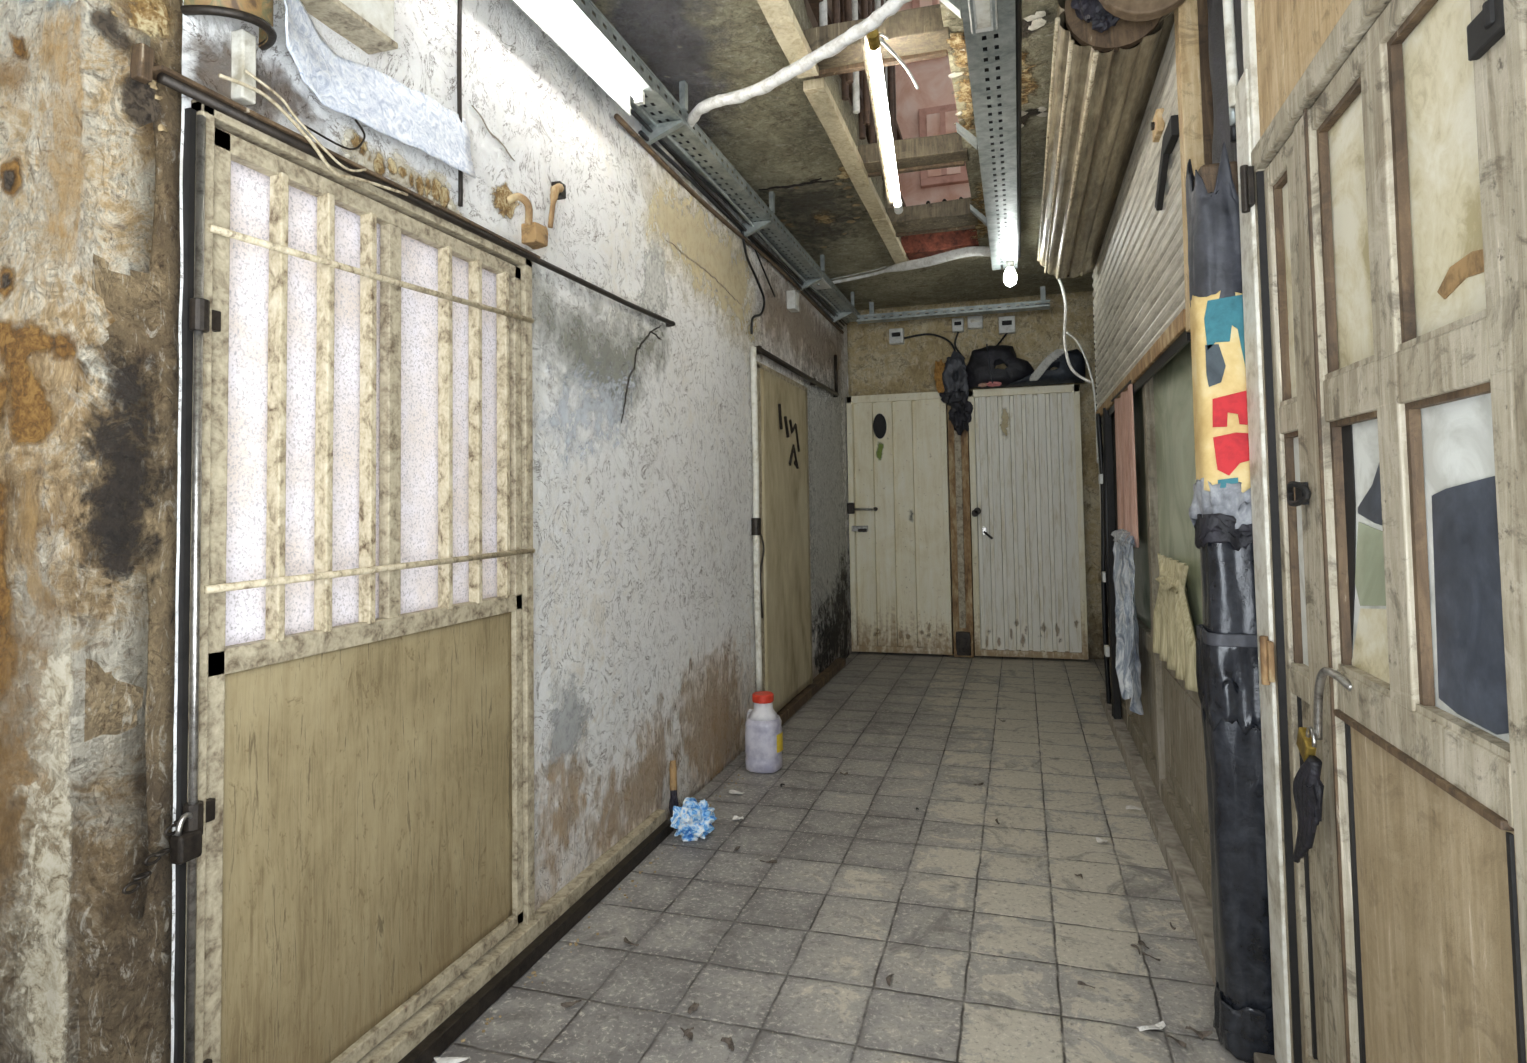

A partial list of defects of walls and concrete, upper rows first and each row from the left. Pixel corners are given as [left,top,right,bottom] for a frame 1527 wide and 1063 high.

damp [80,343,172,596]
damp [812,548,852,674]